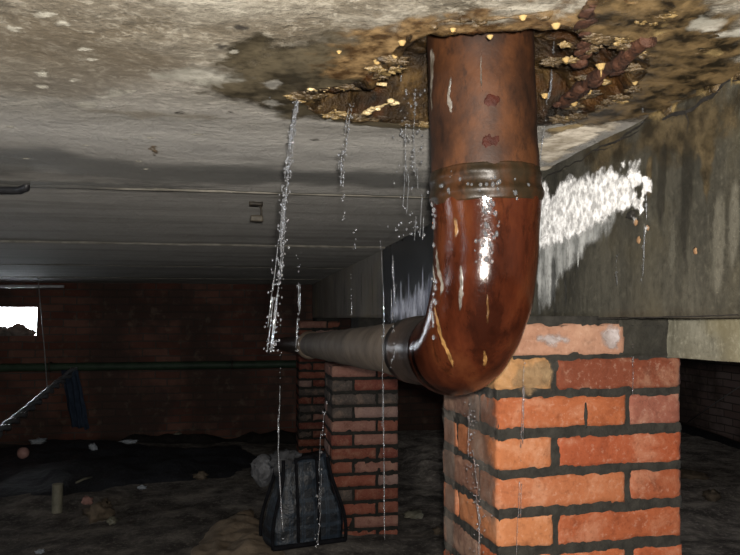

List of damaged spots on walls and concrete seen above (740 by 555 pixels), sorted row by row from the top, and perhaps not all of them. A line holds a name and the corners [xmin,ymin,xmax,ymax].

water stain [205,31,365,120]
water stain [333,98,425,130]
rust [324,8,491,79]
spalling [283,23,665,170]
water stain [430,10,553,30]
rust [505,0,657,109]
water stain [570,0,740,126]
spalling [634,11,678,29]
water stain [537,160,652,306]